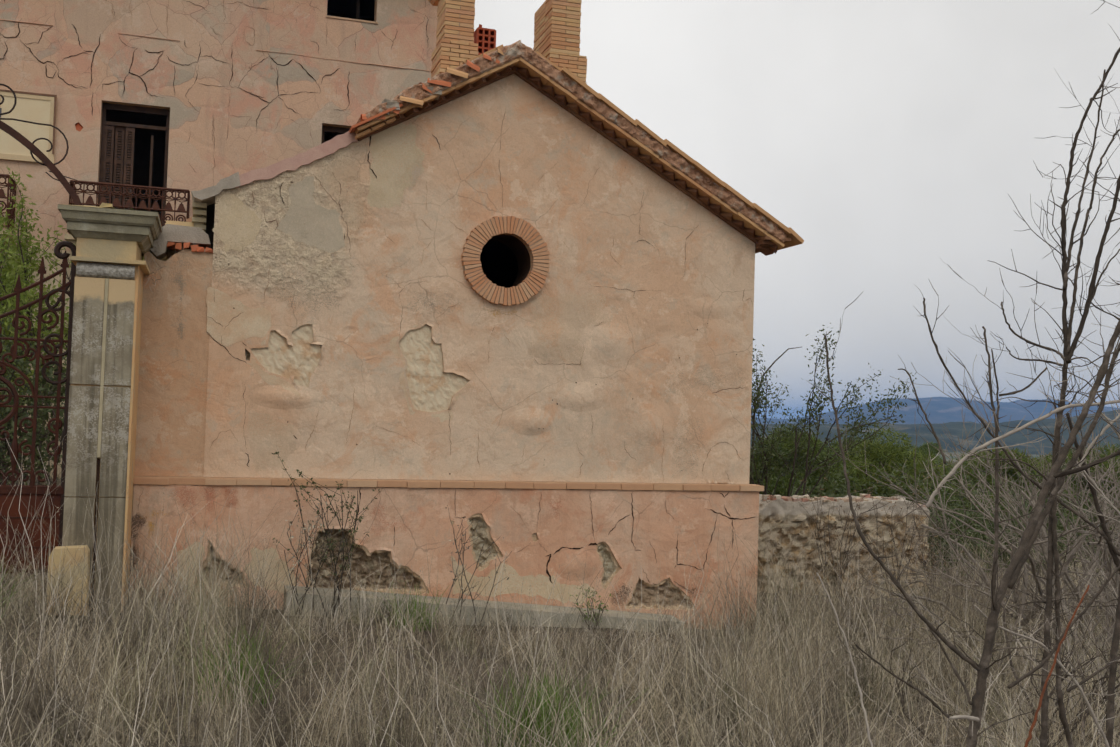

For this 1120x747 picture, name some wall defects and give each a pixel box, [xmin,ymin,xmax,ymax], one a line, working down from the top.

crack [0,0,350,182]
flaking render [213,193,262,253]
crack [313,174,351,257]
crack [206,185,285,467]
flaking render [206,287,326,397]
flaking render [389,322,471,422]
crack [454,413,754,592]
flaking render [196,539,246,587]
flaking render [306,525,428,594]
flaking render [450,511,623,605]
flaking render [626,575,695,610]